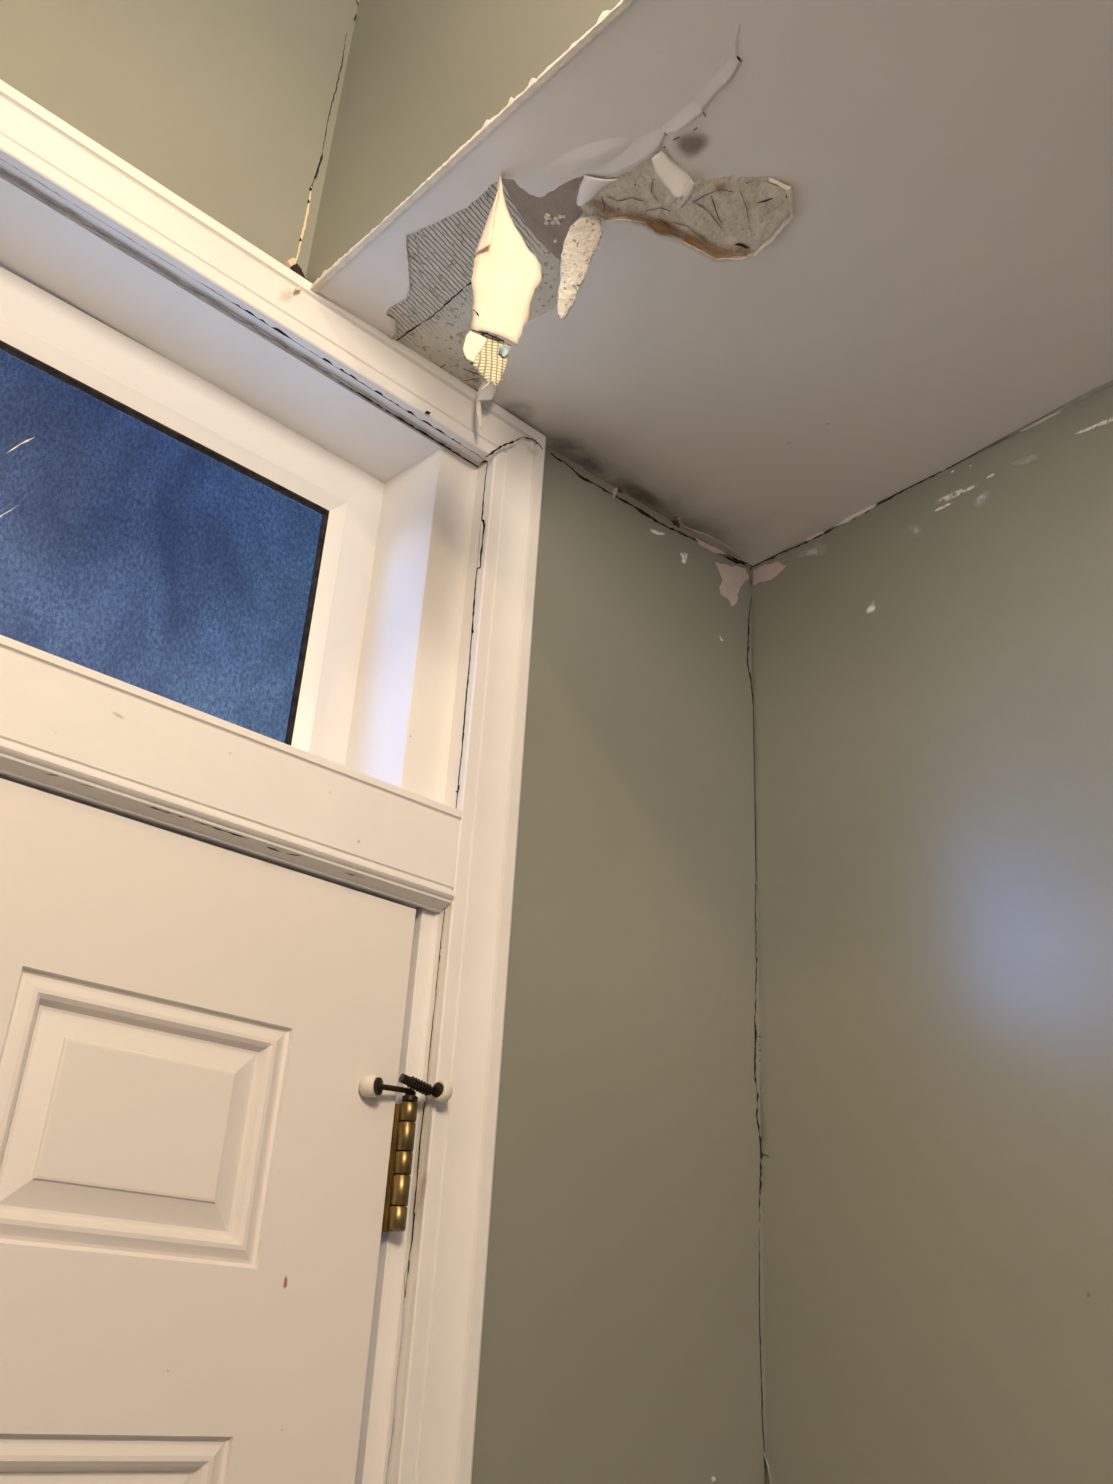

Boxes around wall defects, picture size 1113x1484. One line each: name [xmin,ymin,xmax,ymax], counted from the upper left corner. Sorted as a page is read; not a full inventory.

crack [296,0,359,259]
peeling [310,0,794,428]
peeling [673,407,1067,606]
crack [0,158,767,1484]